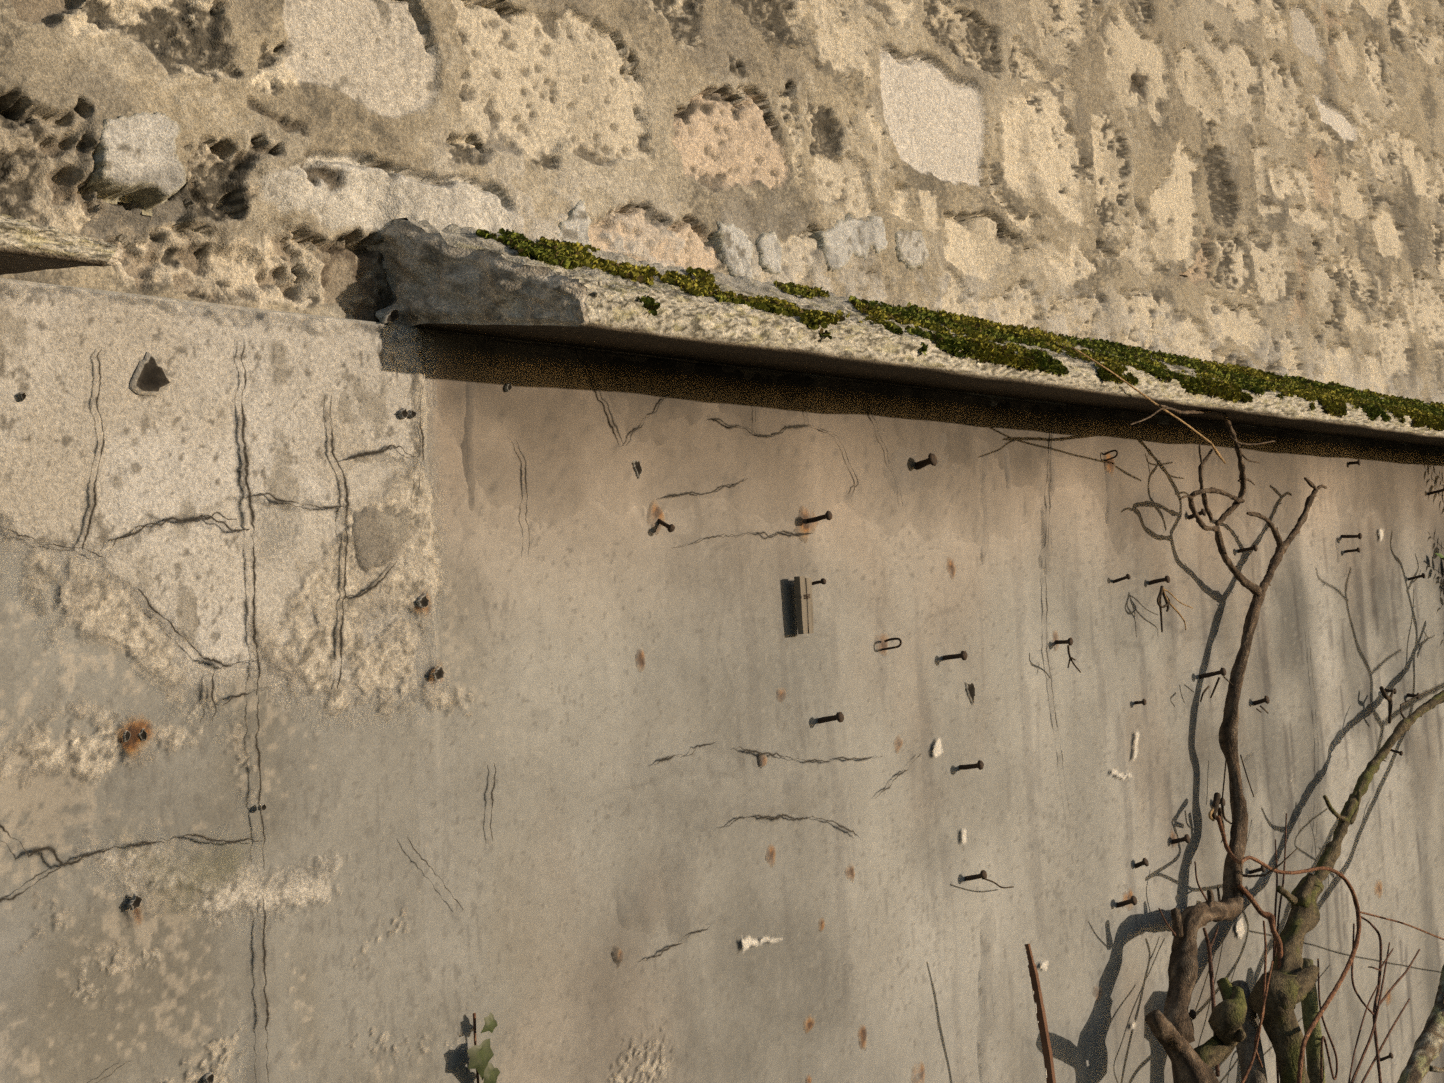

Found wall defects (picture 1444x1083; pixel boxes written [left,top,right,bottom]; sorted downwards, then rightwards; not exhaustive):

damp [1,324,436,717]
peeling [0,280,474,716]
rust [647,499,665,535]
crack [661,478,748,499]
rust [794,505,819,543]
rust [946,556,956,580]
damp [1039,410,1058,575]
crack [0,344,426,1082]
crack [713,814,861,840]
crack [655,742,921,797]
damp [1242,754,1256,880]
damp [976,901,996,1083]